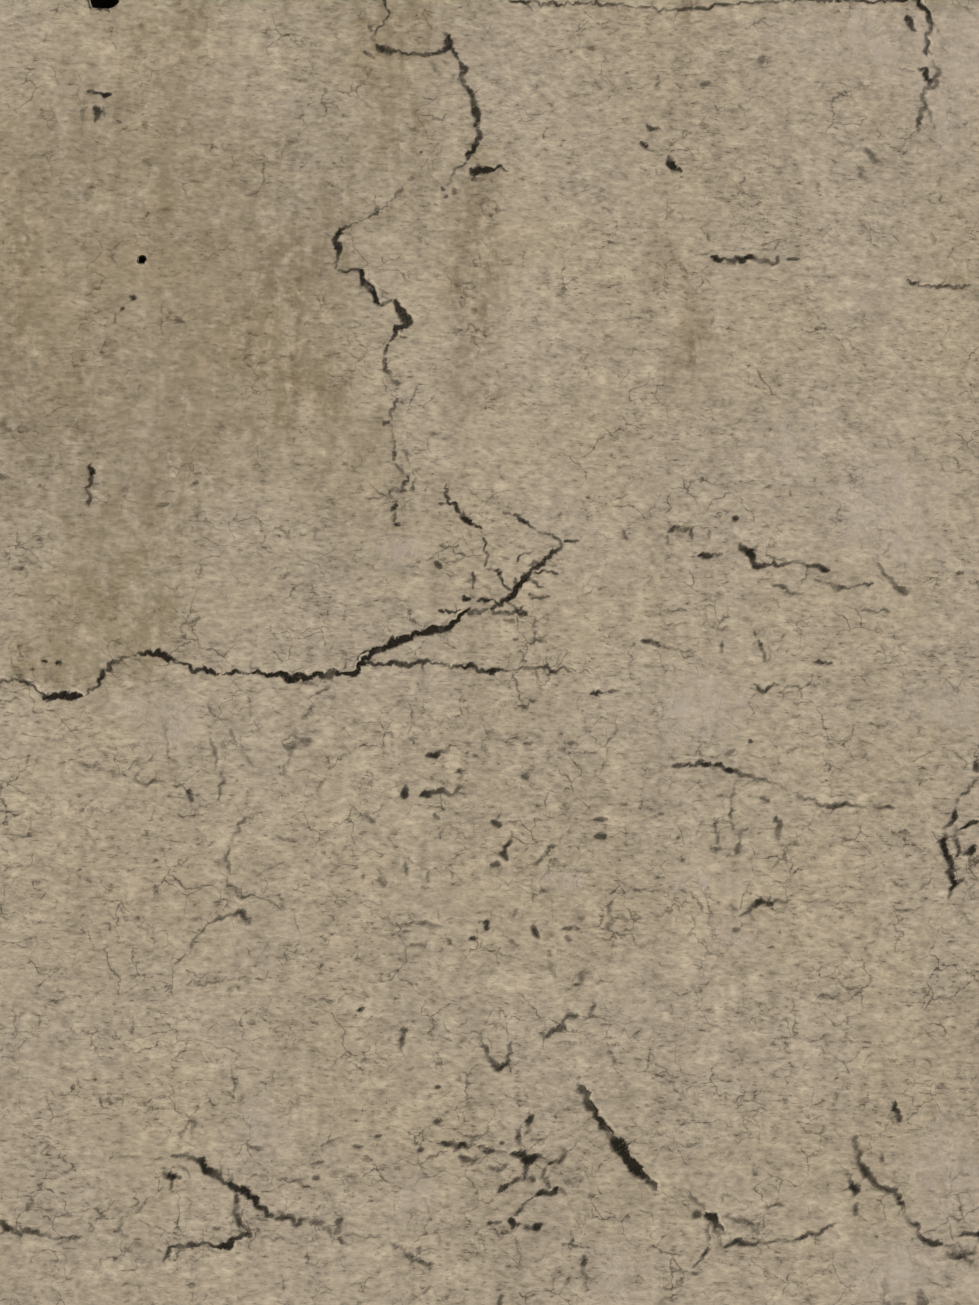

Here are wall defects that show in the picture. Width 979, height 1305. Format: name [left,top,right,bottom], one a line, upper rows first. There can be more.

crack [510,0,756,11]
crack [364,0,508,181]
crack [794,0,937,124]
crack [332,212,415,374]
crack [711,254,799,265]
crack [0,487,579,702]
crack [668,515,906,594]
crack [941,760,979,894]
crack [577,1082,661,1191]
crack [163,1154,344,1264]
crack [692,1209,758,1275]
crack [848,1151,979,1259]